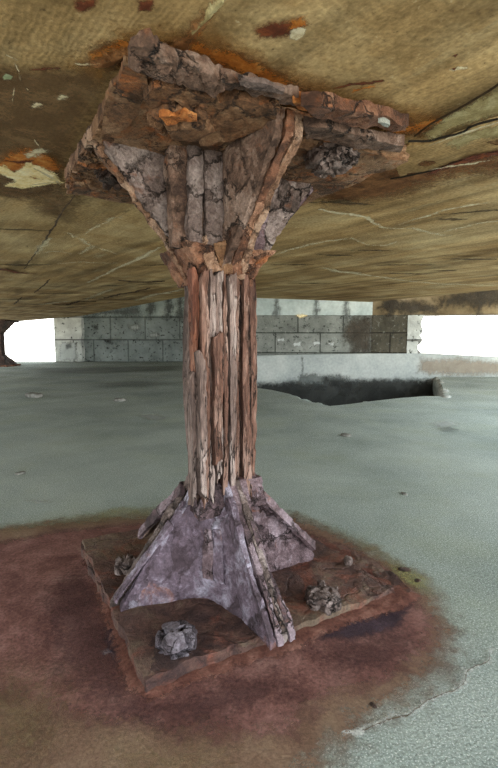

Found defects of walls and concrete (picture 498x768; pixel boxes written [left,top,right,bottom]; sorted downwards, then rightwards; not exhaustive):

rust [255,17,309,40]
crack [408,83,498,143]
spalling [0,140,64,189]
crack [390,150,498,180]
crack [24,195,75,269]
crack [14,279,182,305]
water stain [377,284,498,317]
rust [64,28,443,650]
water stain [342,301,372,353]
rust [0,480,459,768]
crack [342,649,493,736]